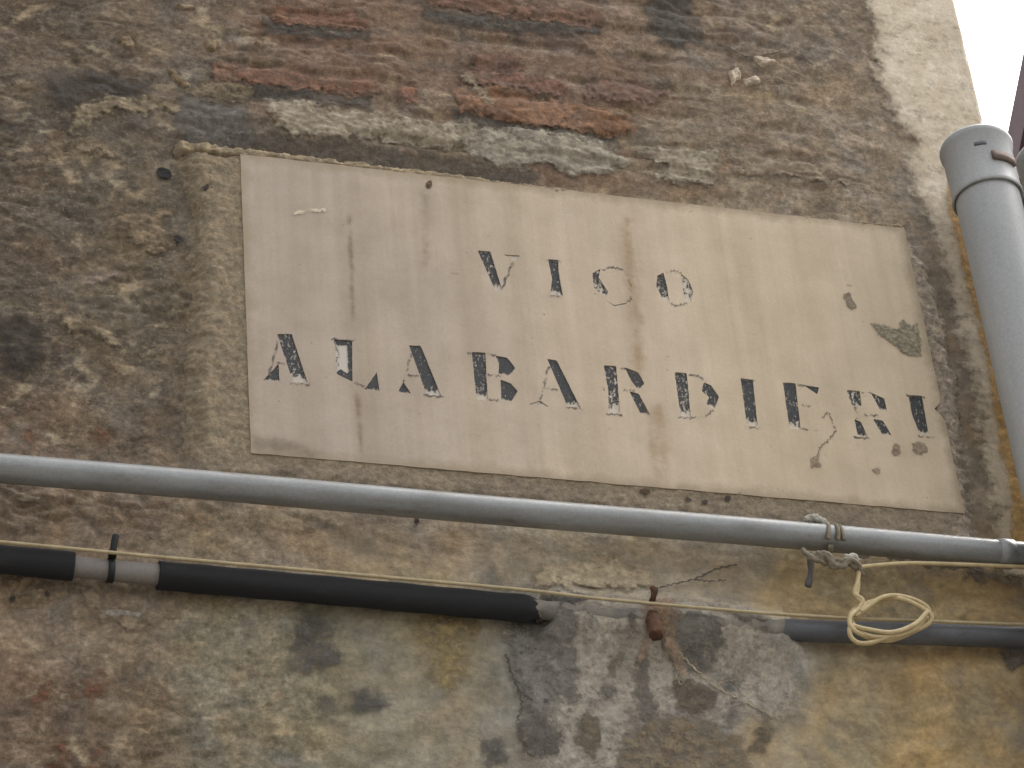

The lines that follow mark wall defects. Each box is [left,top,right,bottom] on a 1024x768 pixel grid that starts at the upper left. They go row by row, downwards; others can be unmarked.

spalling [252,5,370,49]
spalling [423,0,605,35]
spalling [205,40,421,110]
spalling [452,49,668,147]
spalling [870,320,922,356]
crack [657,564,737,589]
peeling [503,591,807,768]